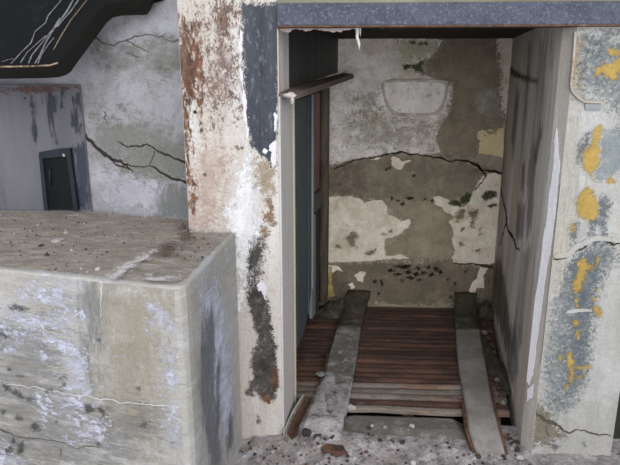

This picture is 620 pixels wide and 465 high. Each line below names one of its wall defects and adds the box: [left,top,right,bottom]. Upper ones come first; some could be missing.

leakage [0,279,181,465]
crack [86,134,187,184]
corrosion [178,0,246,215]
leakage [199,271,235,465]
corrosion [261,369,280,404]
peeling [238,0,453,273]
leakage [328,38,518,387]
crack [333,79,520,251]
peeling [433,173,501,293]
peeling [477,38,513,158]
peeling [526,128,620,449]
crack [536,410,611,436]